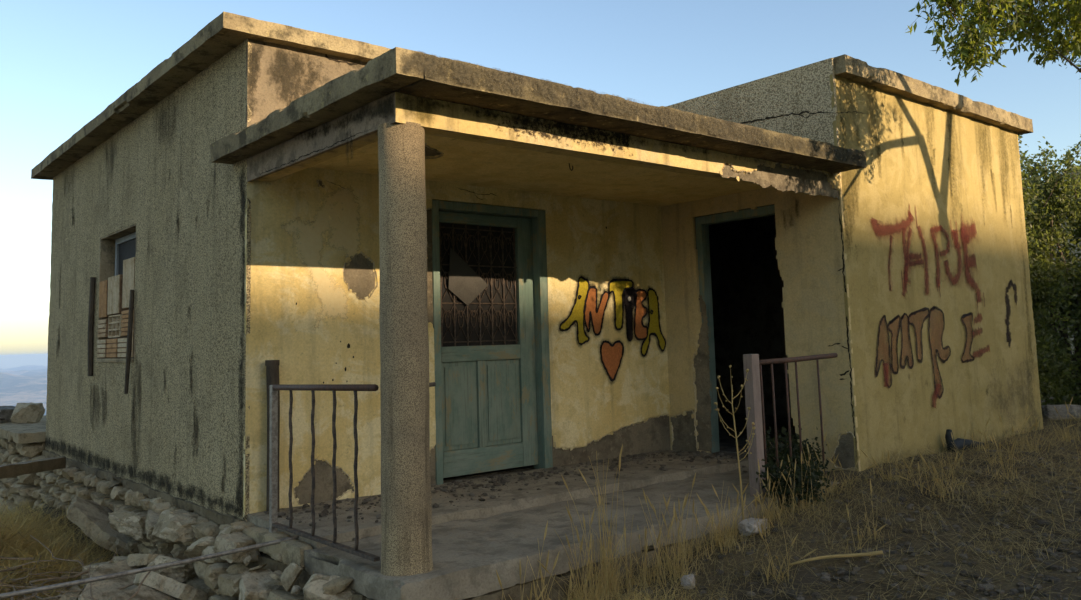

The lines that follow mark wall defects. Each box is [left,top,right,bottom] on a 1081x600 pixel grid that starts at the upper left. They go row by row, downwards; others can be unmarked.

damp [247,48,318,117]
damp [402,51,862,240]
spalling [719,158,840,199]
crack [740,111,862,124]
peeling [282,179,379,328]
damp [45,365,245,517]
flaking render [292,455,355,505]
flaking render [552,294,712,467]